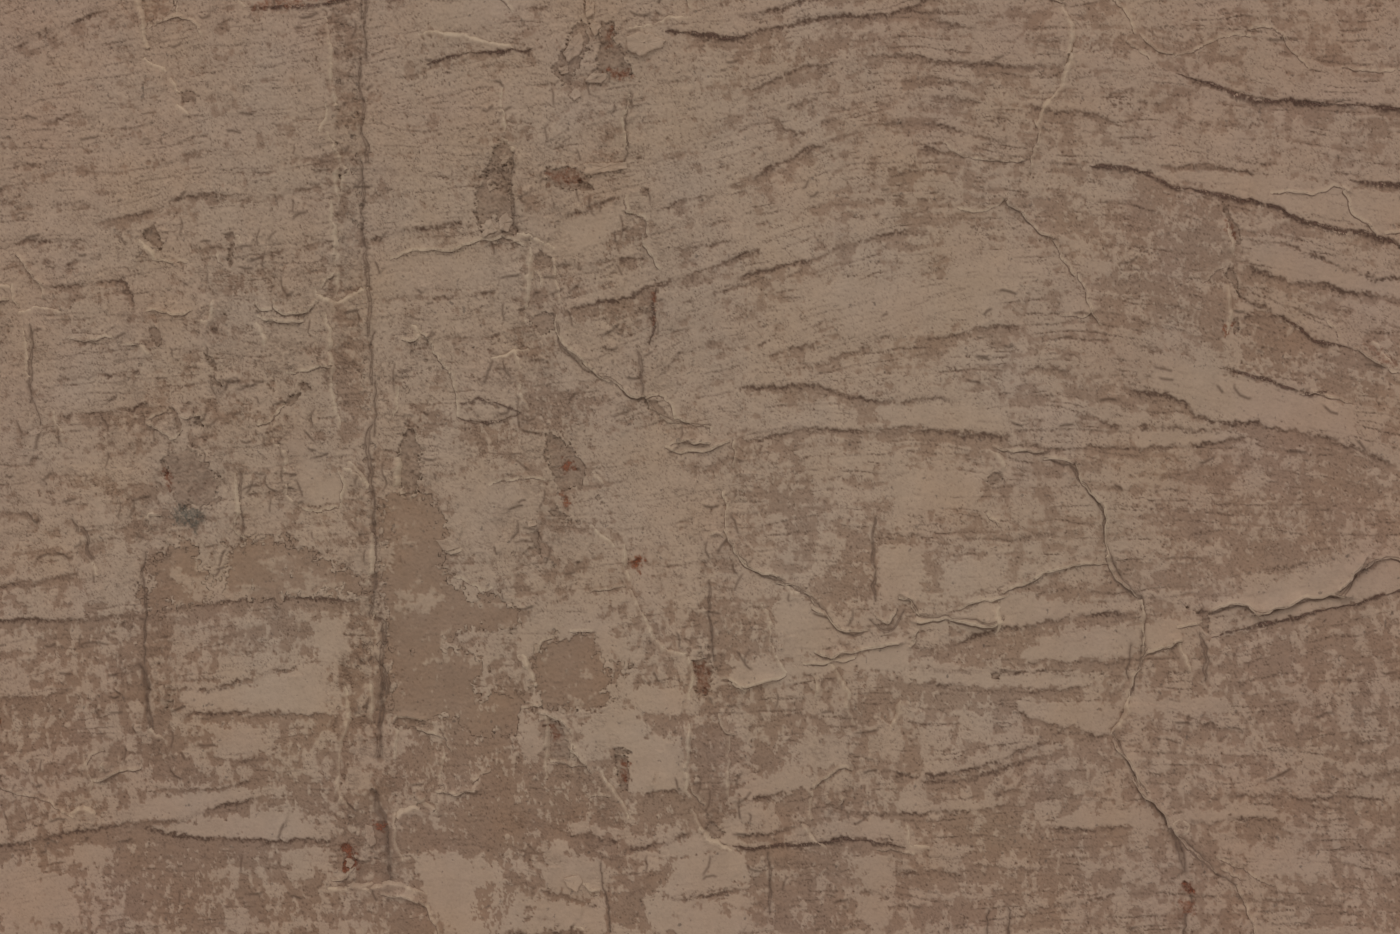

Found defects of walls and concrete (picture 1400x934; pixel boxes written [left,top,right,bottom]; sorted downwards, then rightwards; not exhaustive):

crack [943,0,1076,169]
crack [1112,0,1400,110]
crack [1091,164,1400,246]
spalling [142,402,204,440]
spalling [391,325,530,424]
crack [254,0,739,880]
crack [1221,368,1352,404]
crack [1279,315,1400,374]
peeling [136,428,634,862]
crack [586,443,1400,934]
spalling [328,867,443,934]